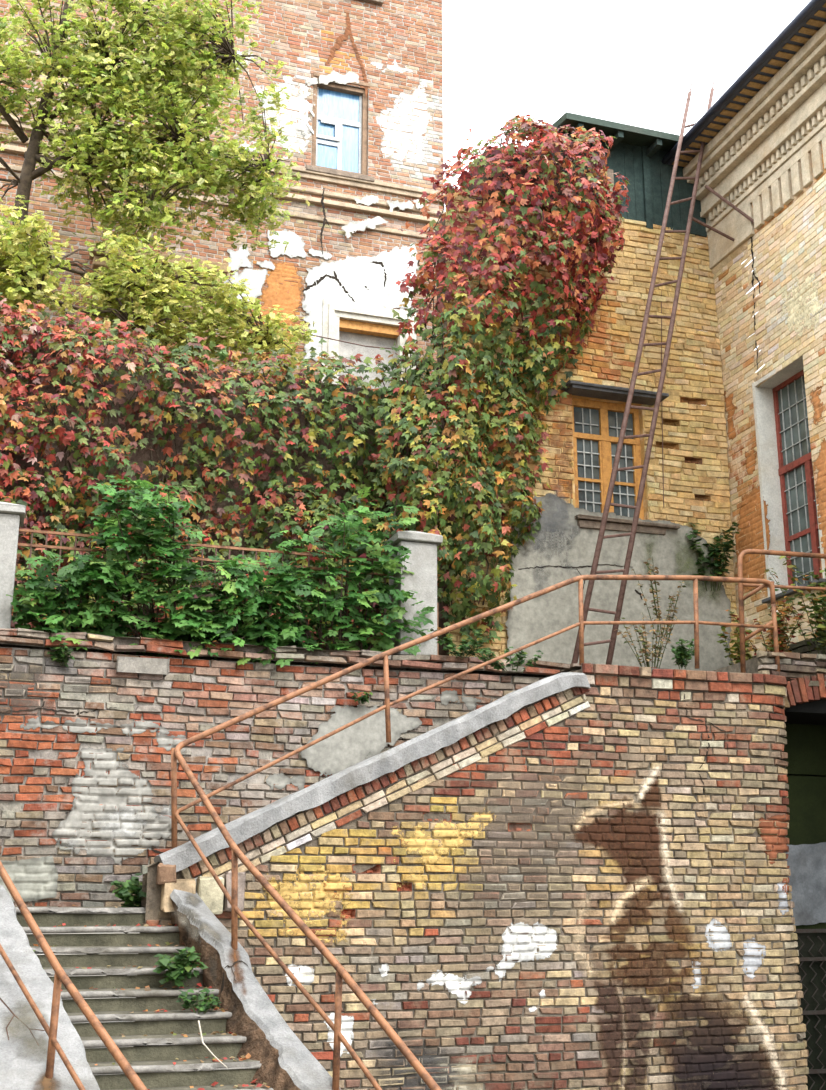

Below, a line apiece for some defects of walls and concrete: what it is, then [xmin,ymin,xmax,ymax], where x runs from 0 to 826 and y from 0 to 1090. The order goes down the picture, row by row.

flaking render [371,60,412,73]
flaking render [237,70,359,159]
flaking render [376,77,434,165]
crack [303,188,387,302]
flaking render [341,194,429,238]
flaking render [223,225,418,362]
peeling [810,386,824,425]
peeling [813,438,826,578]